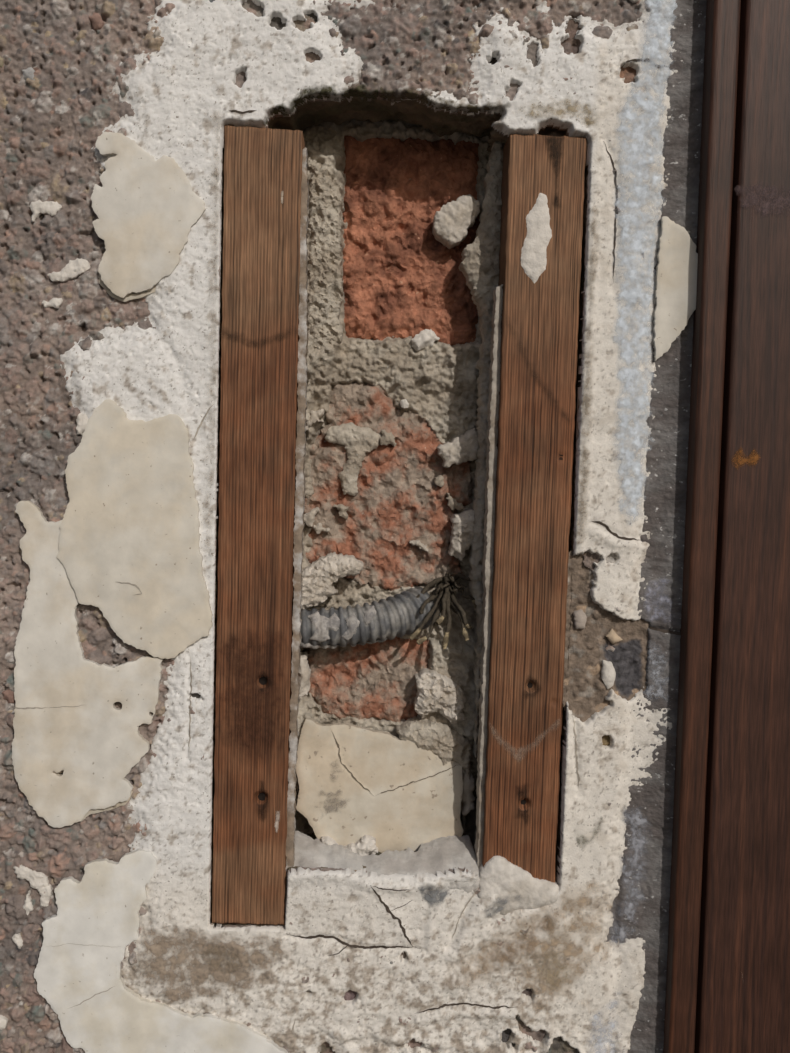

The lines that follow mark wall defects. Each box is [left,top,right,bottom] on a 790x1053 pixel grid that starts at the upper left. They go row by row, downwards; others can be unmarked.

crack [592,521,637,540]
flaking render [563,550,649,722]
crack [333,734,456,793]
crack [287,885,420,956]
crack [452,888,478,938]
crack [419,1003,514,1013]